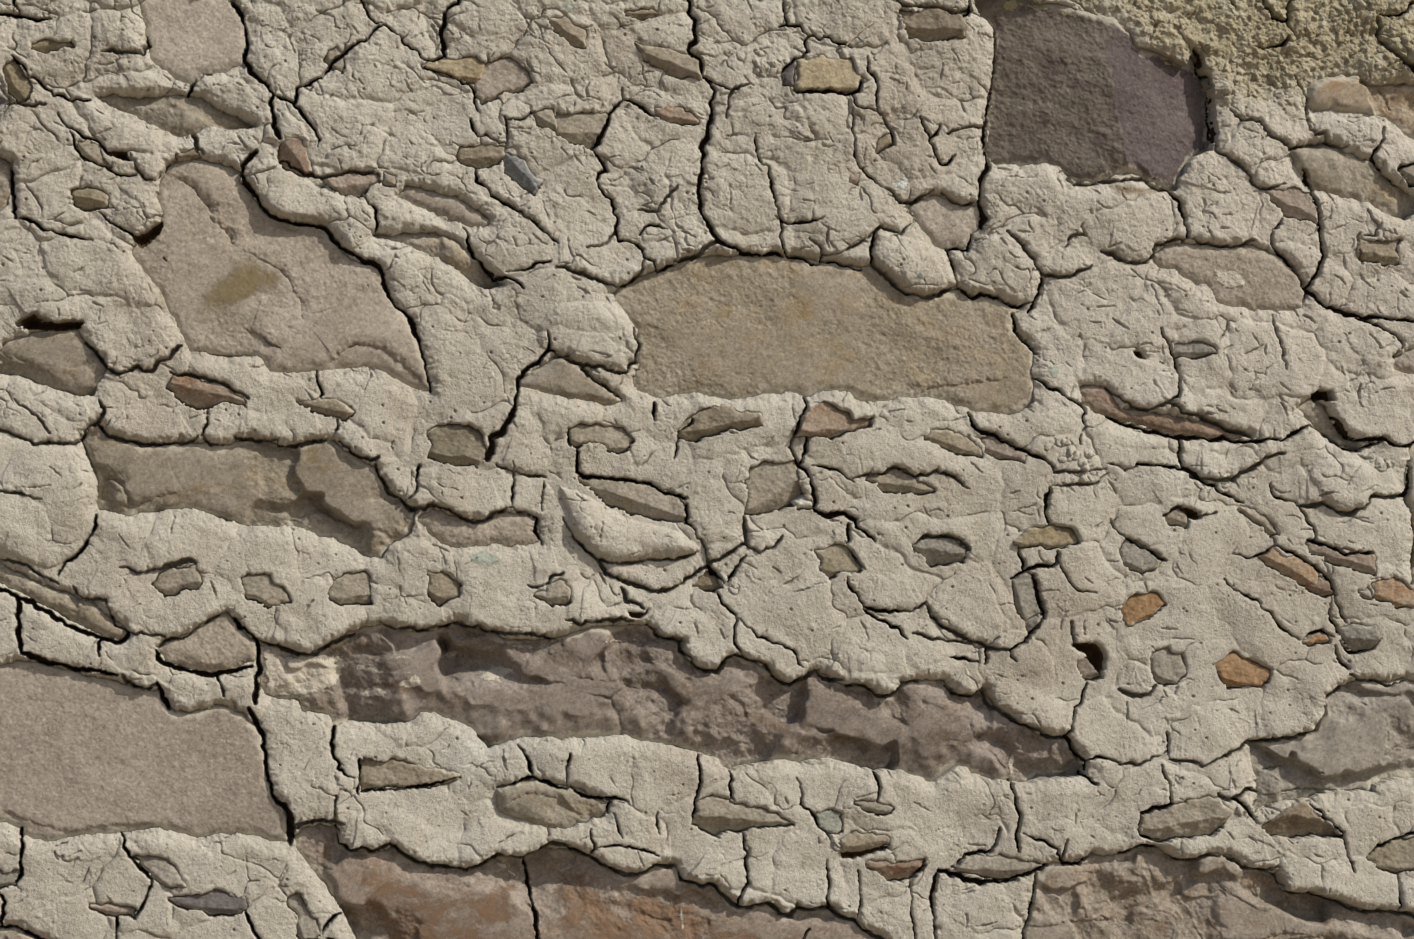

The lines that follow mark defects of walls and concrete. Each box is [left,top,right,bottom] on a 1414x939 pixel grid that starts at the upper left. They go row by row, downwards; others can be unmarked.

crack [232,0,531,393]
crack [591,100,672,273]
crack [686,0,875,271]
crack [485,335,555,460]
crack [567,434,695,530]
crack [779,0,1414,668]
crack [0,589,293,843]
peeling [263,645,421,699]
crack [330,726,444,793]
peeling [477,663,513,683]
crack [512,751,659,856]
crack [908,732,1171,939]